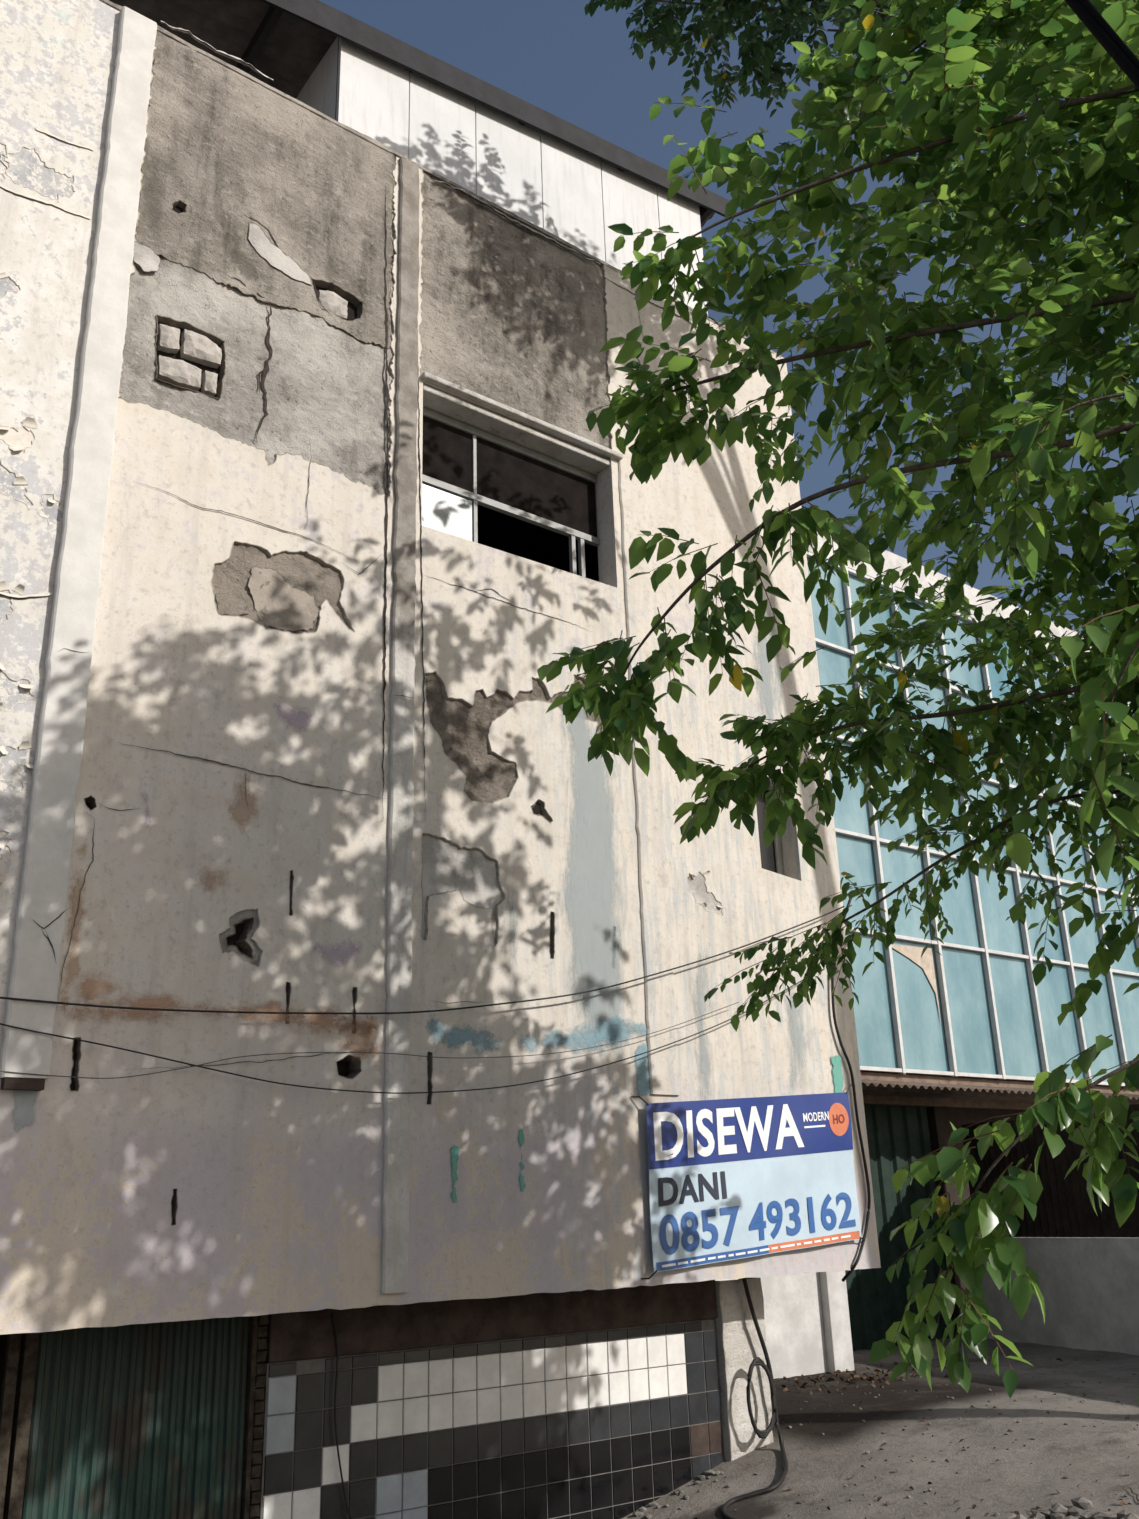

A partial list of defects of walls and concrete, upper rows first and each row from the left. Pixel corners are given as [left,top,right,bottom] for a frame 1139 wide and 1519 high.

peeling [0,142,76,200]
spalling [118,30,397,497]
crack [119,196,582,822]
spalling [212,541,355,634]
peeling [0,741,36,793]
spalling [425,671,603,804]
spalling [219,908,263,967]
spalling [421,833,505,946]
water stain [521,707,650,1095]
rust [79,980,176,1018]
rust [238,1003,377,1056]
water stain [429,1019,494,1049]